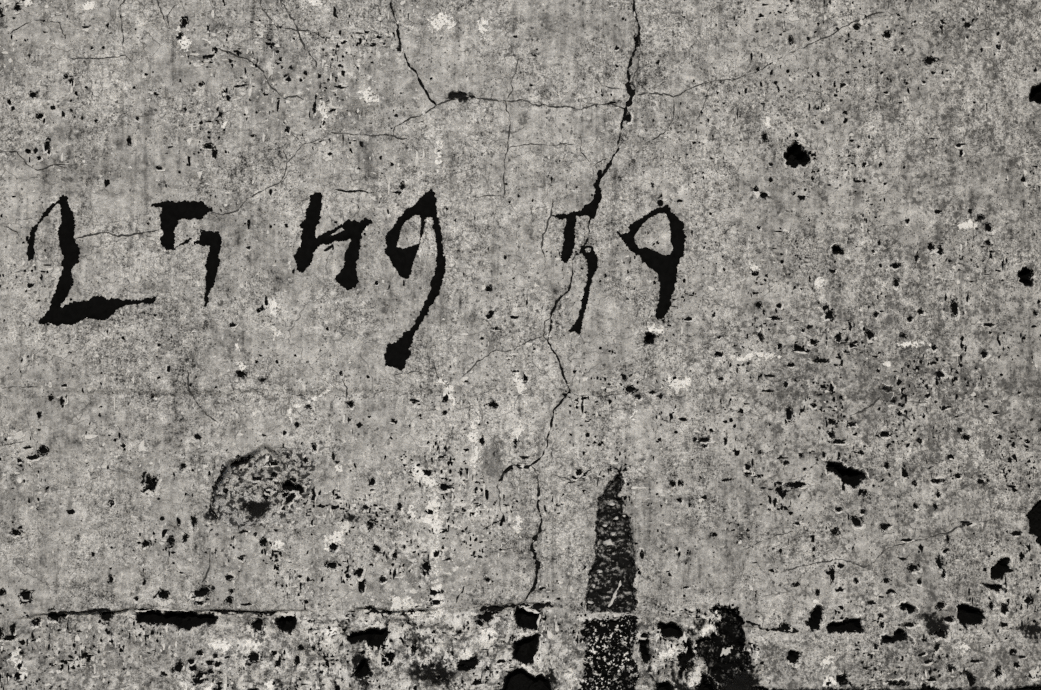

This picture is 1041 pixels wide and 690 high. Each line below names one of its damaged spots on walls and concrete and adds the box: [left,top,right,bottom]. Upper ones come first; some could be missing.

crack [10,0,136,69]
crack [214,0,903,215]
crack [541,199,554,263]
crack [394,218,617,601]